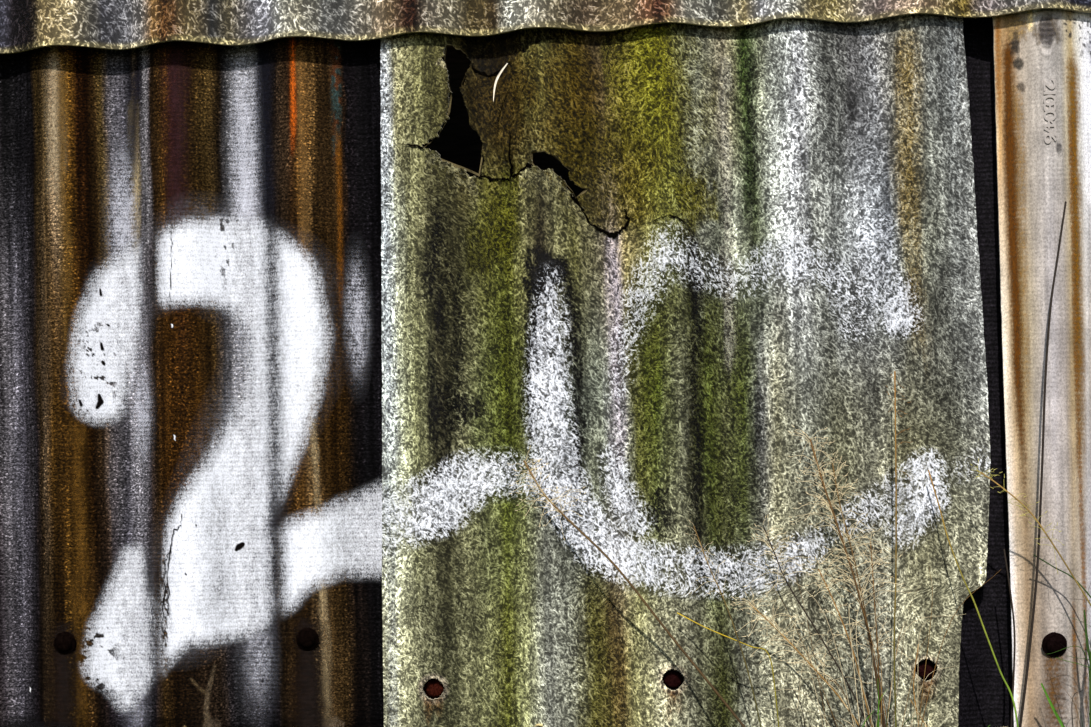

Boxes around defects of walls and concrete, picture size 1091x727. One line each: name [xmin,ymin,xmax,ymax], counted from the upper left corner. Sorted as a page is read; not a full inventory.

corrosion [290,37,307,260]
corrosion [331,40,342,279]
water stain [380,67,393,445]
water stain [423,213,485,449]
crack [471,60,512,77]
spalling [424,31,560,181]
crack [479,136,532,181]
water stain [485,245,586,502]
water stain [648,487,676,537]
water stain [688,236,766,530]
corrosion [995,22,1027,459]
corrosion [1046,60,1087,727]